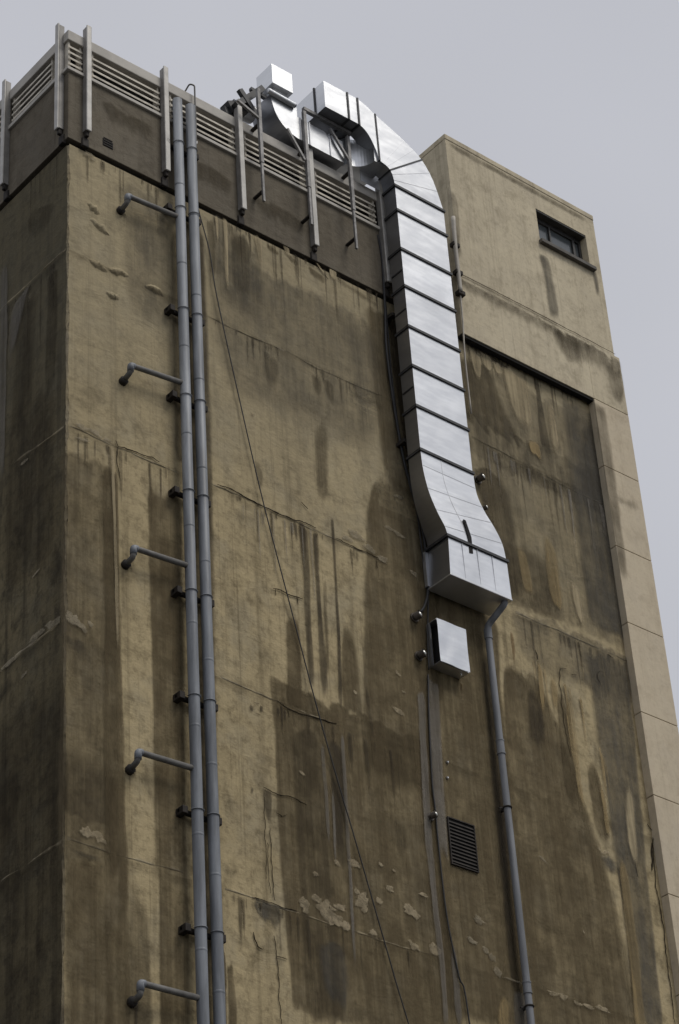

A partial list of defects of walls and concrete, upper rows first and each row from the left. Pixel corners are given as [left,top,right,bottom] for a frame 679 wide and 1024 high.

crack [116,442,159,478]
leakage [186,217,289,552]
crack [218,484,378,566]
leakage [48,448,139,1024]
leakage [149,469,184,874]
crack [278,701,337,724]
leakage [250,288,662,1024]
leakage [160,886,185,1024]
leakage [202,771,236,1024]
spalling [300,885,394,931]